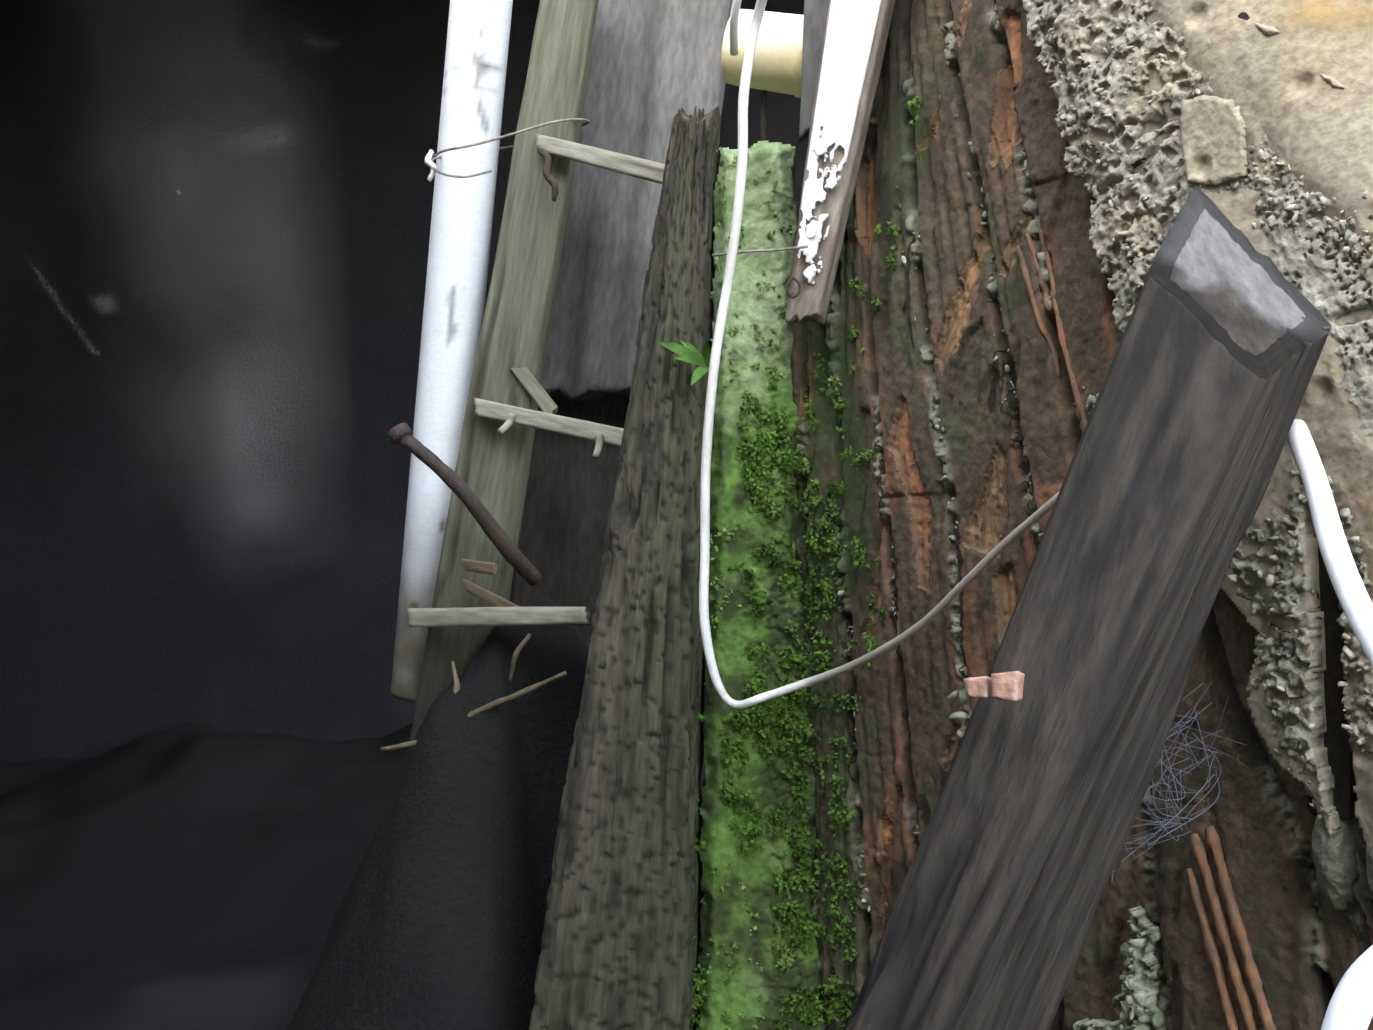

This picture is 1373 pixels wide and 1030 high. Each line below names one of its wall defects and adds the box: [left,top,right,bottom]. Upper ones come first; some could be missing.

peeling [798,0,882,284]
spalling [914,0,1373,437]
spalling [1223,470,1373,830]